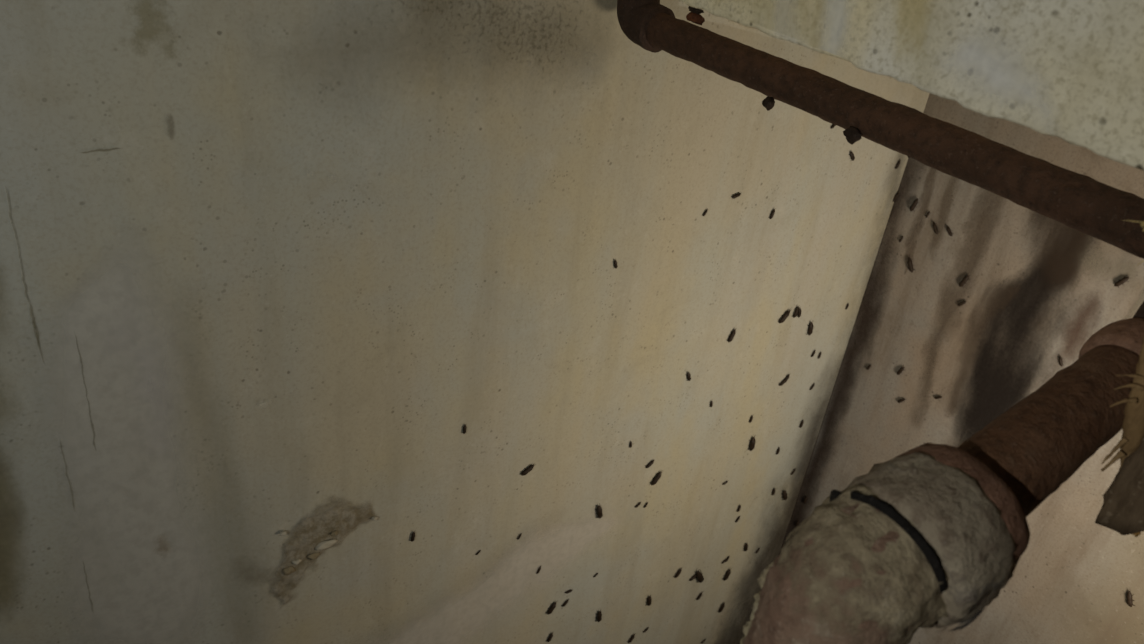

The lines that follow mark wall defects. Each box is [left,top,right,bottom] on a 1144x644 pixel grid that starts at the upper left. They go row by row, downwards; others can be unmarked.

water stain [888,166,913,221]
spalling [273,501,378,605]
water stain [724,239,949,644]
water stain [958,212,1090,443]